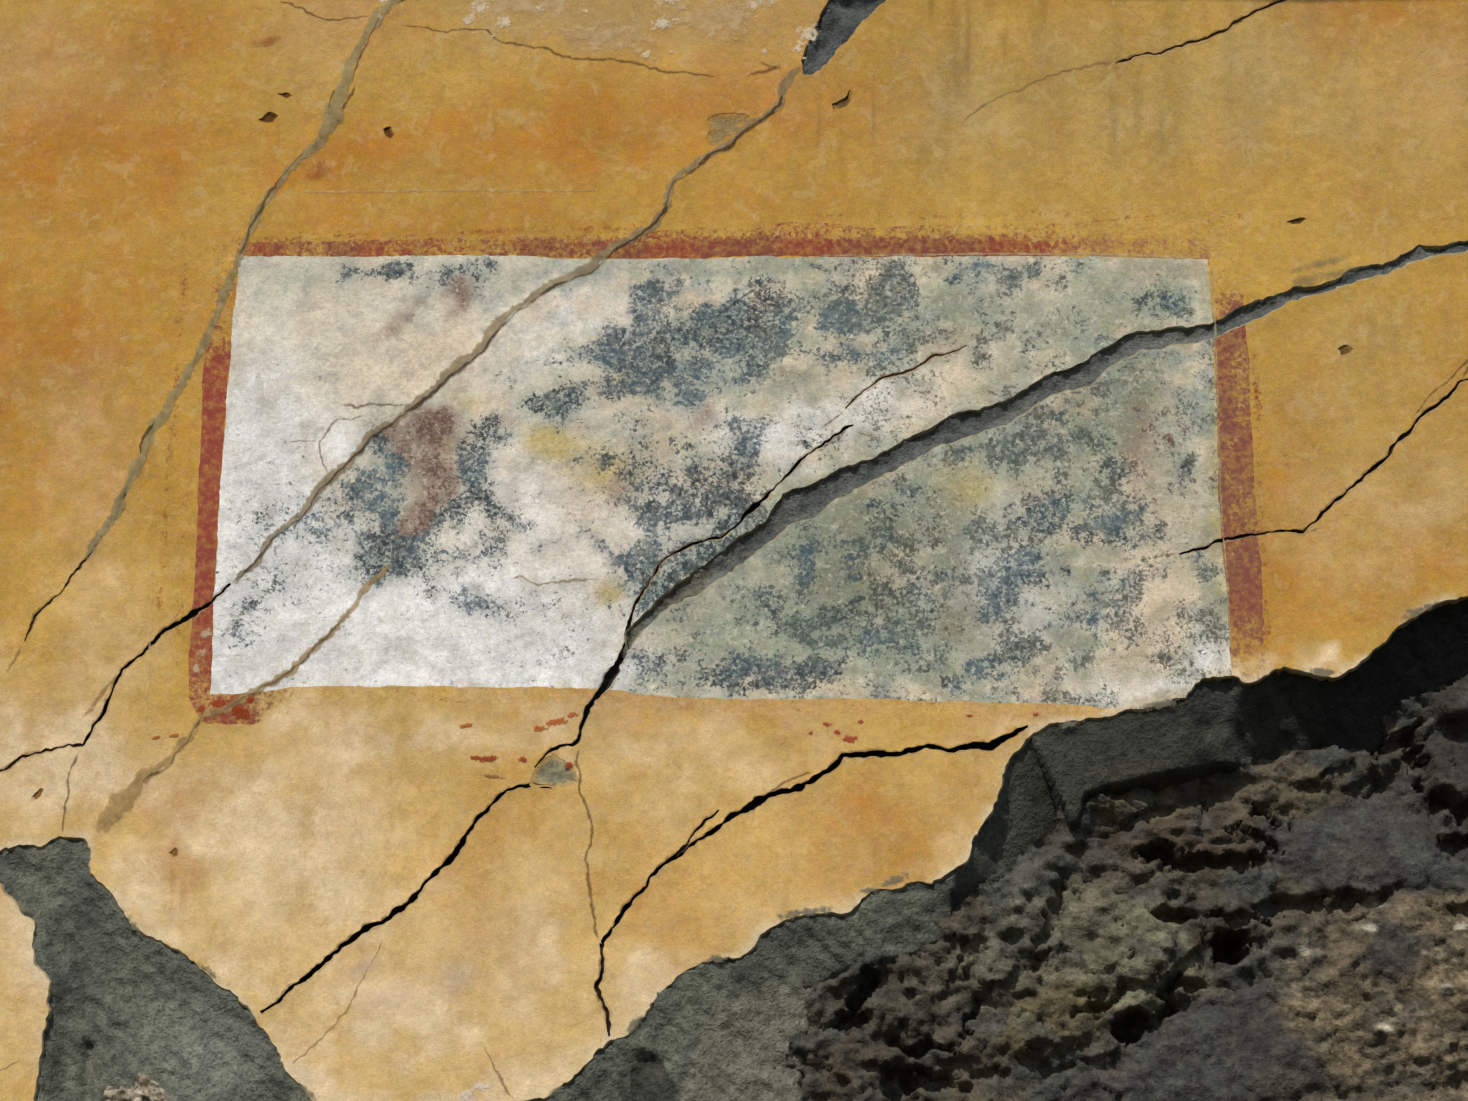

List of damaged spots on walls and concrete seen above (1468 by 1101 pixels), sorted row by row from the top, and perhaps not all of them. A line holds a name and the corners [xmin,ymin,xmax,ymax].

peeling [634,0,685,29]
peeling [762,19,817,59]
crack [982,0,1286,106]
crack [0,0,886,831]
peeling [193,628,212,673]
crack [260,240,1468,1056]
flaking render [0,836,313,1101]
flaking render [525,596,1468,1101]